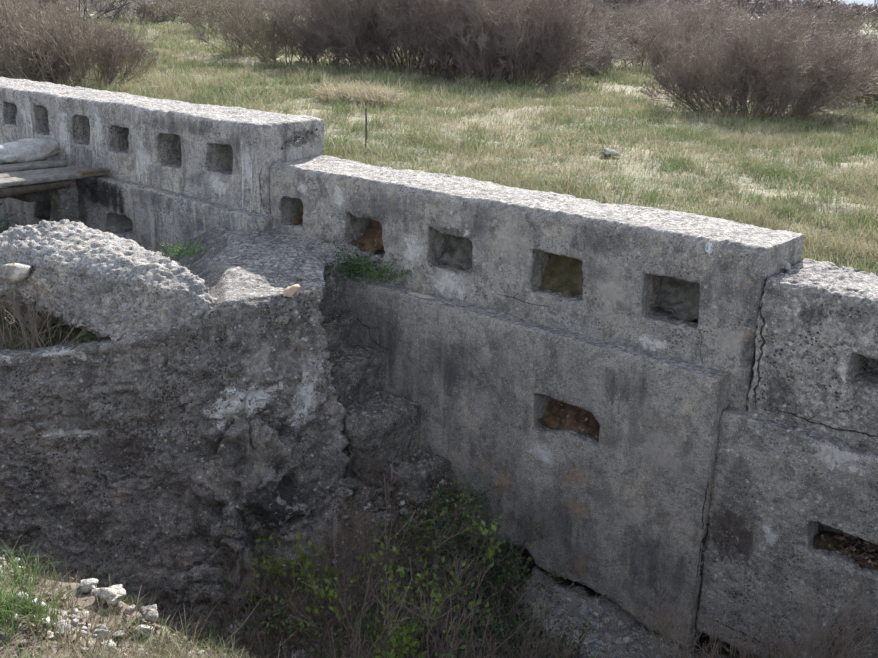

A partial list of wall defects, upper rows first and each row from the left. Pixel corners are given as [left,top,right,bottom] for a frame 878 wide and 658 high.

peeling [292,360,323,429]
crack [753,279,878,441]
crack [655,477,709,597]